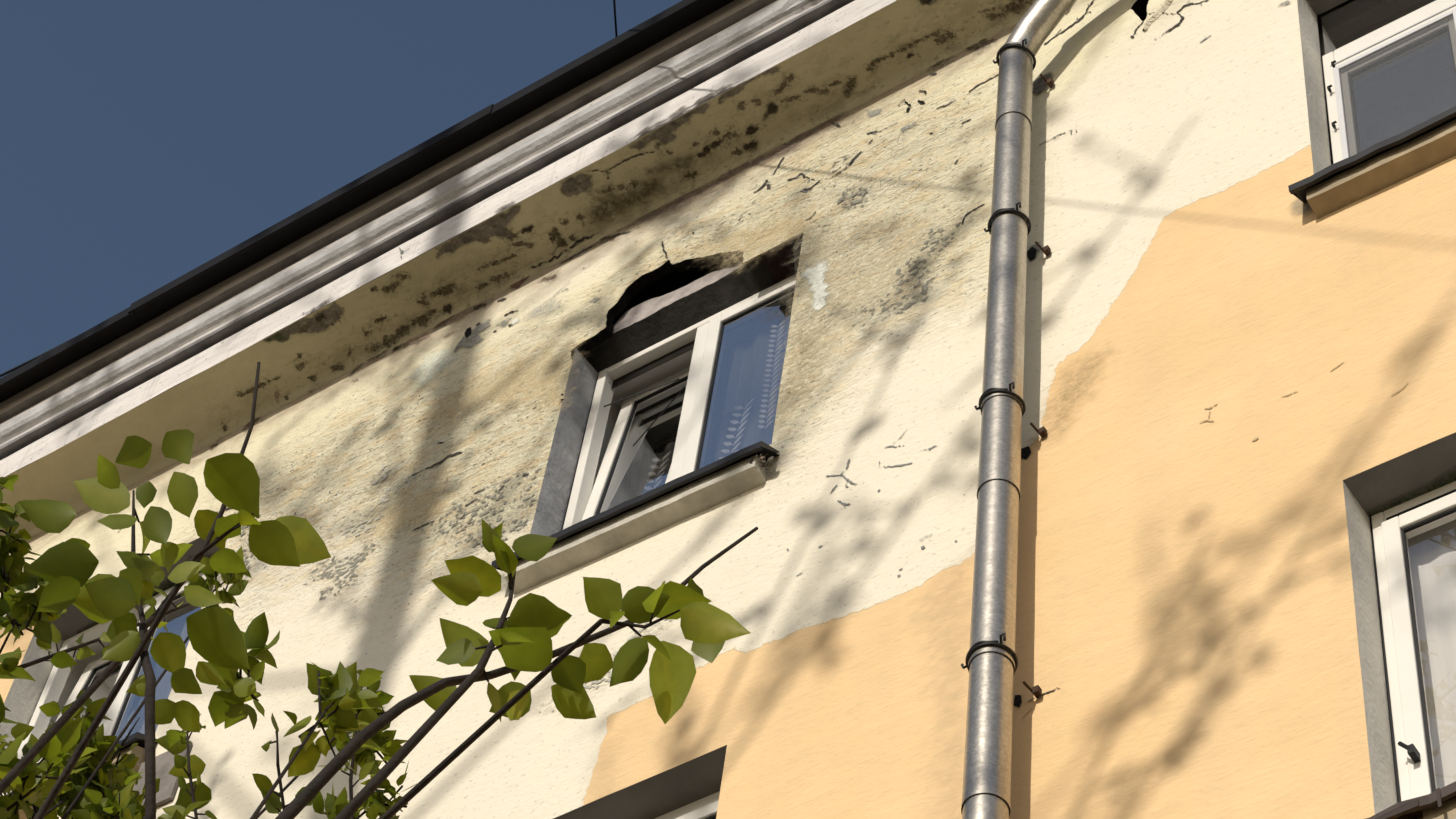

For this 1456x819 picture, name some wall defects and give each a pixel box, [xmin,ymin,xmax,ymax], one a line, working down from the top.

peeling [980,0,1032,20]
crack [1044,0,1094,45]
crack [1130,0,1208,40]
spalling [1032,73,1052,95]
spalling [264,31,996,392]
spalling [1027,244,1040,261]
peeling [238,377,289,402]
spalling [749,454,774,470]
spalling [433,468,540,547]
spalling [303,465,415,600]
spalling [583,619,672,689]
spalling [1014,688,1060,719]